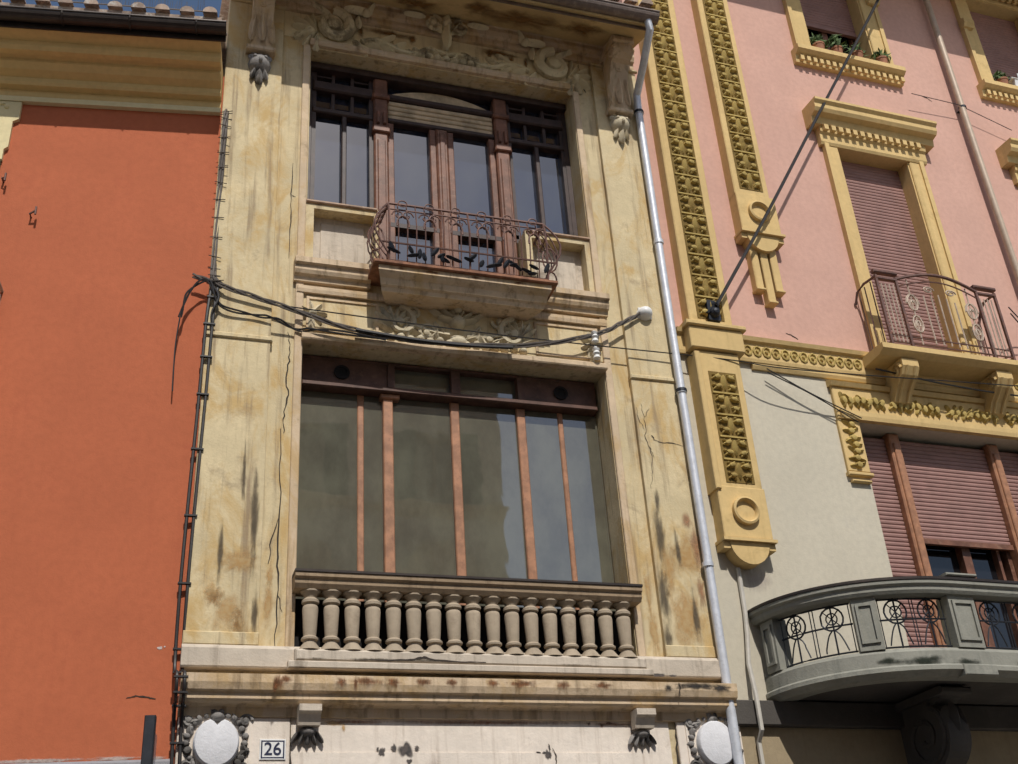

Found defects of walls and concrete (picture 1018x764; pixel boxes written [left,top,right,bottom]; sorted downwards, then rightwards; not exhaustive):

crack [636,405,682,486]
water stain [218,457,258,572]
water stain [206,569,272,632]
water stain [645,493,699,648]
corrosion [338,678,375,687]
spalling [377,742,419,764]